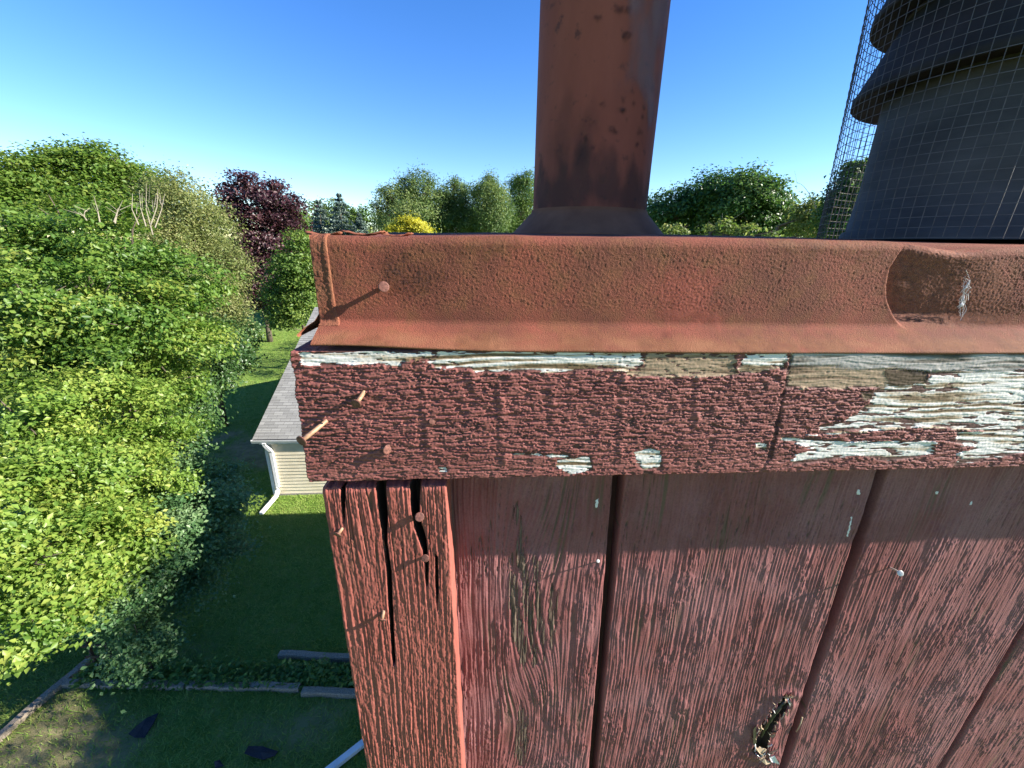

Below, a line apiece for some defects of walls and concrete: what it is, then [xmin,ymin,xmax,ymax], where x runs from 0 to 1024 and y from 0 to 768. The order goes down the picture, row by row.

peeling [298,351,1024,464]
peeling [513,453,592,474]
peeling [634,448,662,470]
crack [339,482,347,522]
crack [376,479,439,664]
spalling [752,698,792,765]